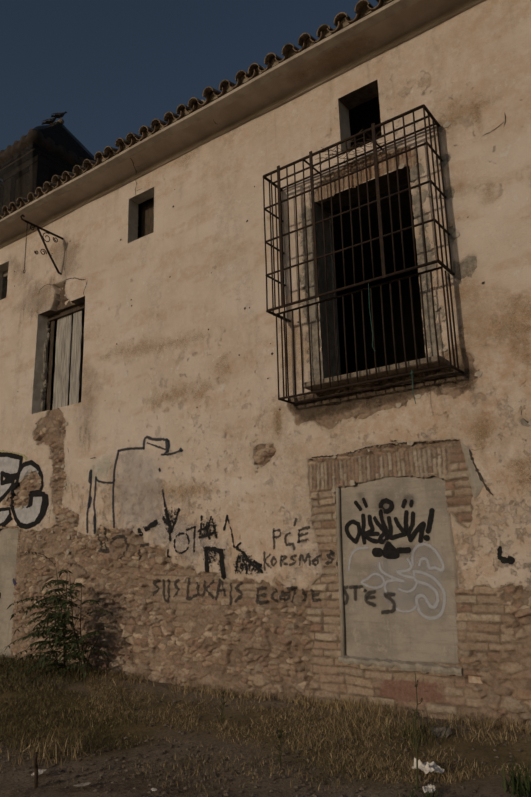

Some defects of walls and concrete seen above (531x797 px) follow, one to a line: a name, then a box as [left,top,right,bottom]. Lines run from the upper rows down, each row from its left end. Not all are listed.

spalling [279,147,482,429]
spalling [0,408,531,731]